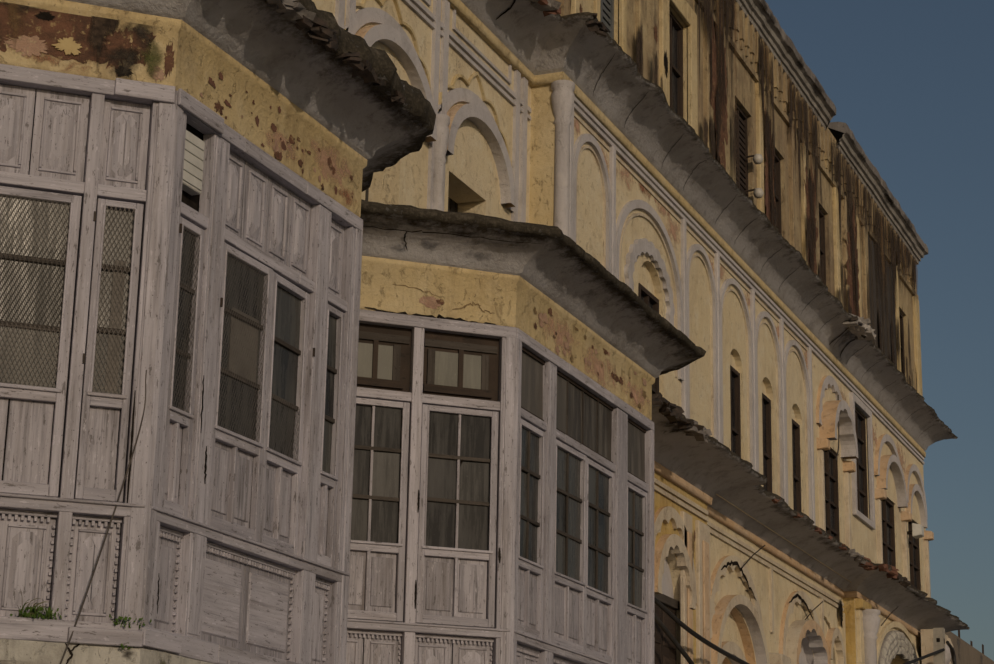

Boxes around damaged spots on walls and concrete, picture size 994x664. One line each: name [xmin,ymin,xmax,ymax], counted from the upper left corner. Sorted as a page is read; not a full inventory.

peeling [0,2,175,81]
damp [698,0,737,162]
damp [756,31,777,228]
crack [363,226,538,250]
damp [788,78,918,392]